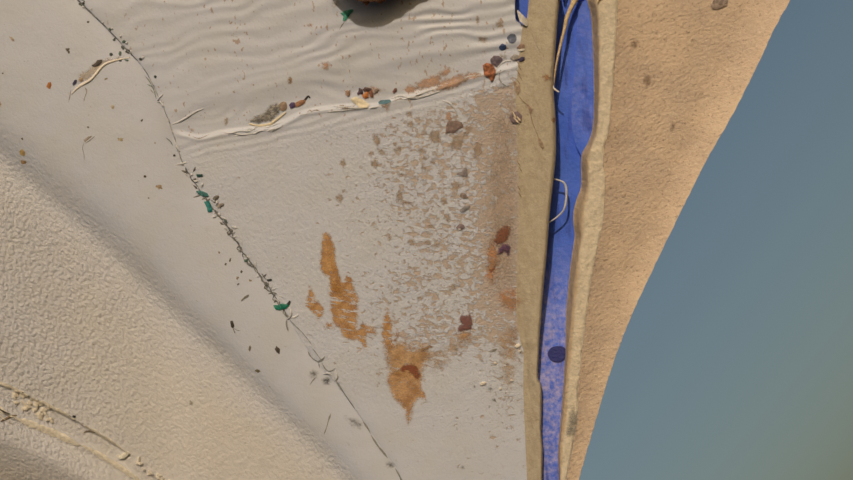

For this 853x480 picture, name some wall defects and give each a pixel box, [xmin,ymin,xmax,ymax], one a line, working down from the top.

peeling [69,57,130,100]
peeling [300,85,448,116]
peeling [273,299,299,319]
corrosion [306,233,442,421]
peeling [0,381,170,480]